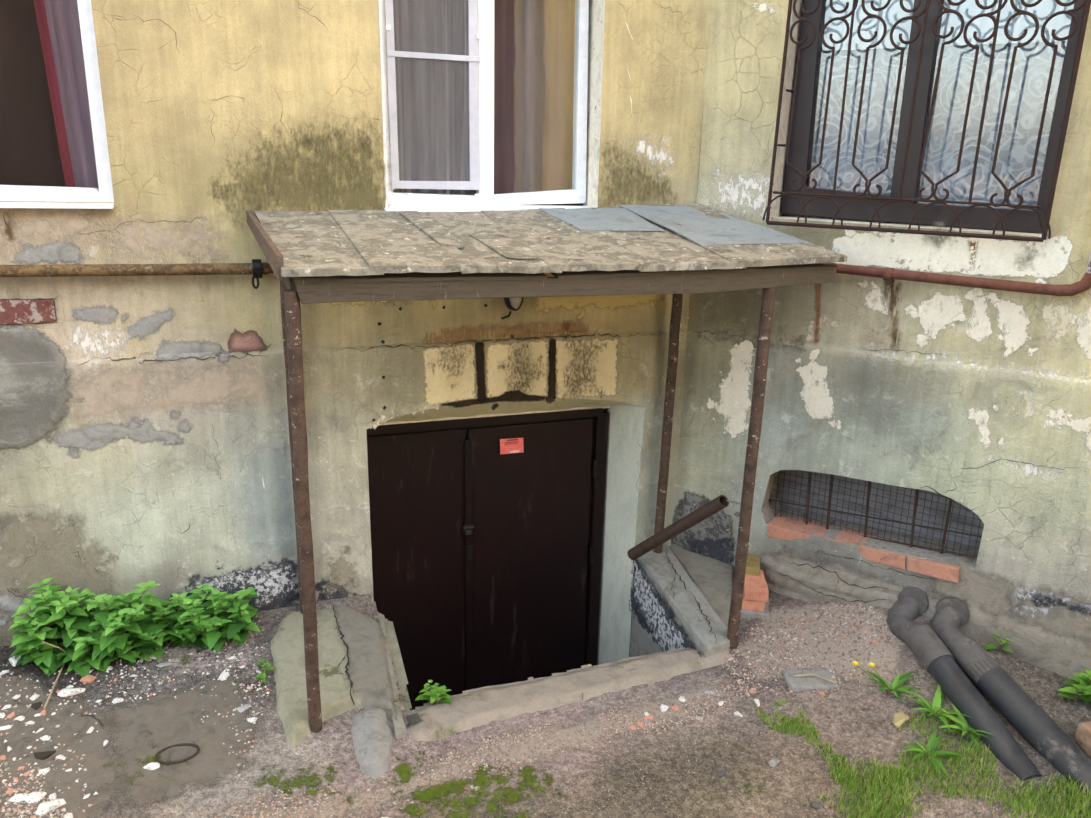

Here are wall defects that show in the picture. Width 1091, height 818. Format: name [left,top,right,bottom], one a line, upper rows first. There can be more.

leakage [234,132,382,211]
flaking render [0,298,59,325]
spalling [69,314,128,356]
peeling [706,340,755,439]
peeling [795,314,853,430]
peeling [857,278,889,316]
peeling [865,288,1091,480]
crack [317,606,355,707]